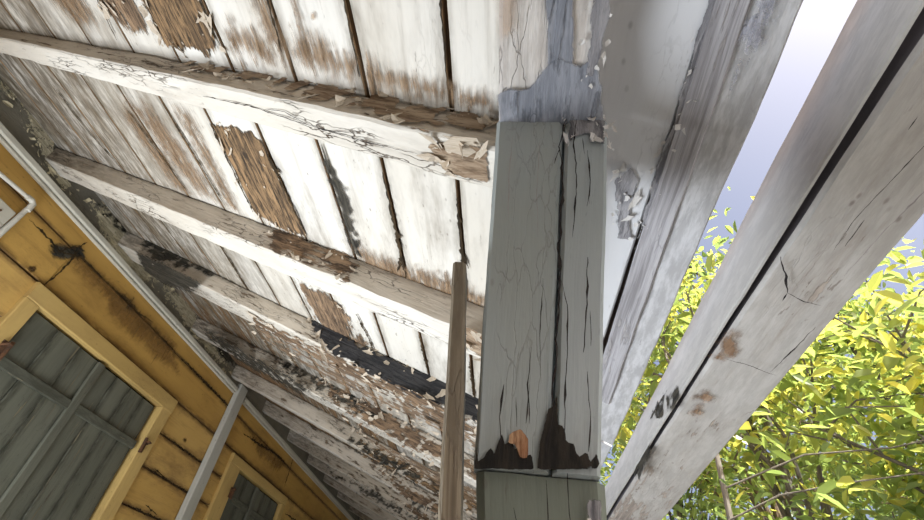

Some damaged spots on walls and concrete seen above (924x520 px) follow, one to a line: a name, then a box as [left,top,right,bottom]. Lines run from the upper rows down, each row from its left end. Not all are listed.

peeling [0,81,233,374]
crack [29,219,228,406]
peeling [210,123,359,285]
peeling [97,0,499,172]
peeling [246,283,446,520]
peeling [463,392,478,516]
peeling [466,331,482,361]
crack [499,119,592,455]
crack [546,469,571,520]
peeling [562,114,617,151]
peeling [578,0,613,89]
peeling [610,0,715,249]